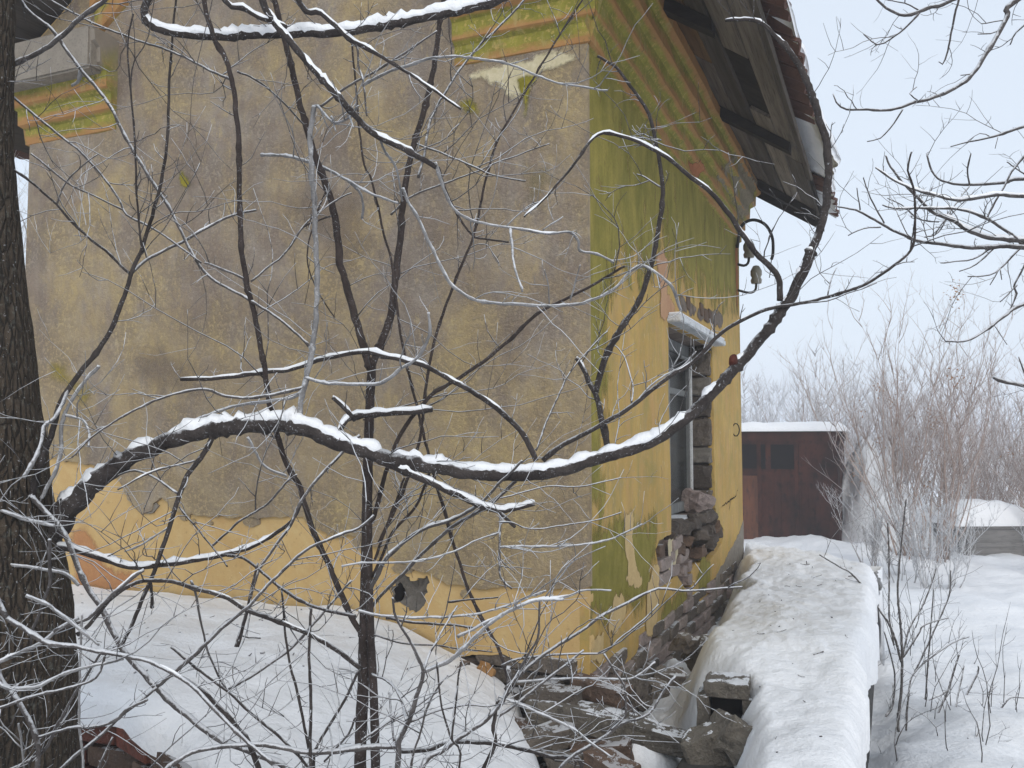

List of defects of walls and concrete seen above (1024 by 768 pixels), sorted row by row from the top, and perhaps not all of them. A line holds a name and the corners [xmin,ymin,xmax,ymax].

peeling [470,50,574,112]
damp [589,50,739,451]
spalling [391,563,430,612]
damp [590,464,657,624]
flaking render [591,347,744,679]
damp [662,592,687,620]